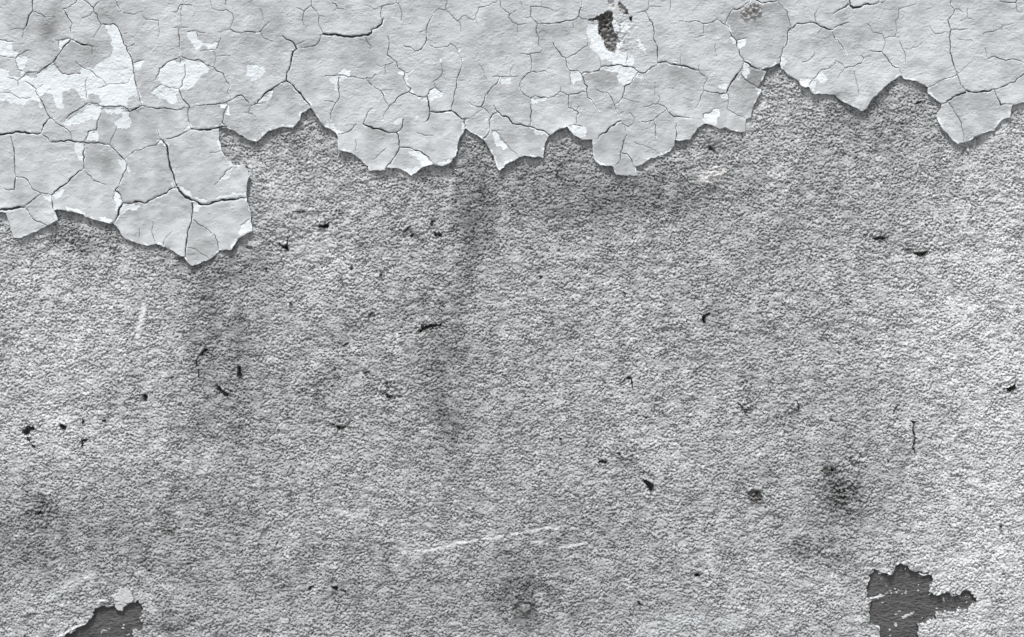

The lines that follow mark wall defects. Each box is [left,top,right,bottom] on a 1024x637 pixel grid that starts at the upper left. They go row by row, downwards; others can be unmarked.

peeling [570,71,588,90]
peeling [586,0,647,86]
peeling [694,1,1024,153]
peeling [0,24,549,266]
crack [0,0,1024,259]
peeling [563,110,681,190]
spalling [59,588,143,637]
spalling [866,562,977,637]